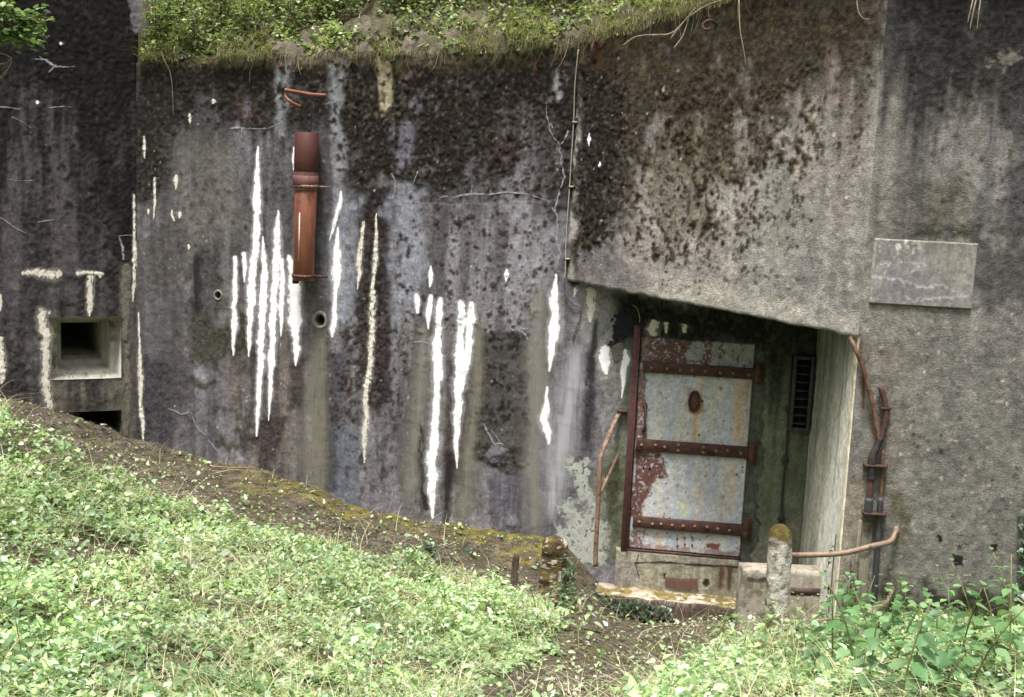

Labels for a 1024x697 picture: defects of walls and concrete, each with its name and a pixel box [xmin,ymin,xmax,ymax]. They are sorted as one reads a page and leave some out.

damp [21,268,62,280]
damp [37,308,53,409]
damp [76,270,104,317]
damp [231,146,343,486]
damp [355,213,378,463]
damp [403,266,482,525]
damp [526,274,630,533]
peeling [554,451,611,568]